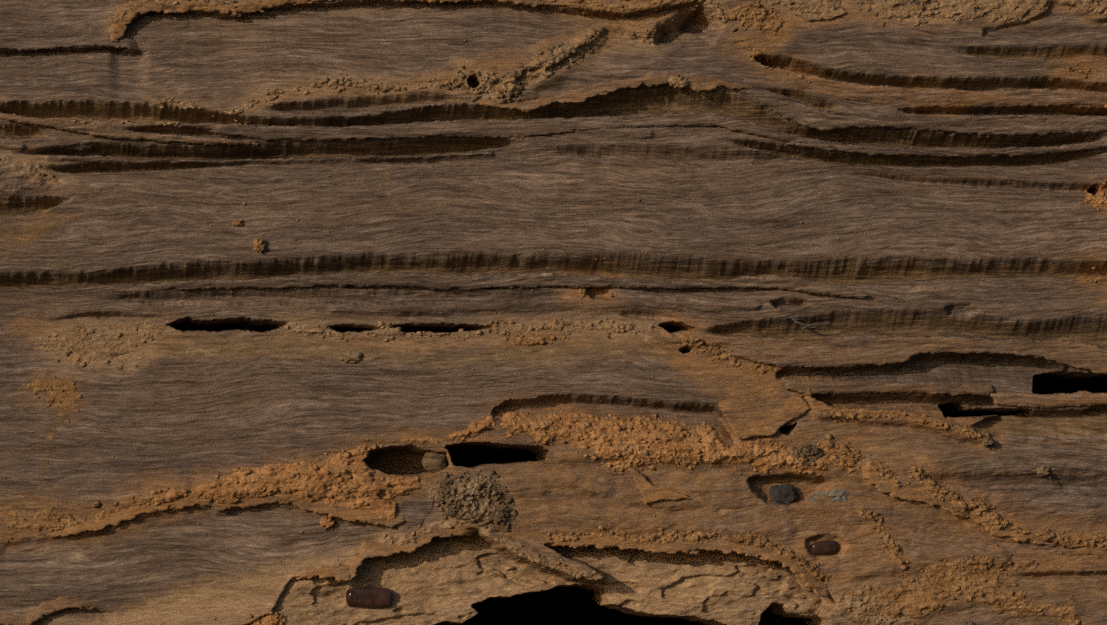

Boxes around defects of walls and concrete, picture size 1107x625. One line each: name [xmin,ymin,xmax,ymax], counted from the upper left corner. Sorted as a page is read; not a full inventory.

crack [0,88,1107,194]
crack [347,283,381,291]
crack [400,314,441,322]
peeling [719,380,944,457]
peeling [628,467,691,504]
spalling [245,527,838,625]